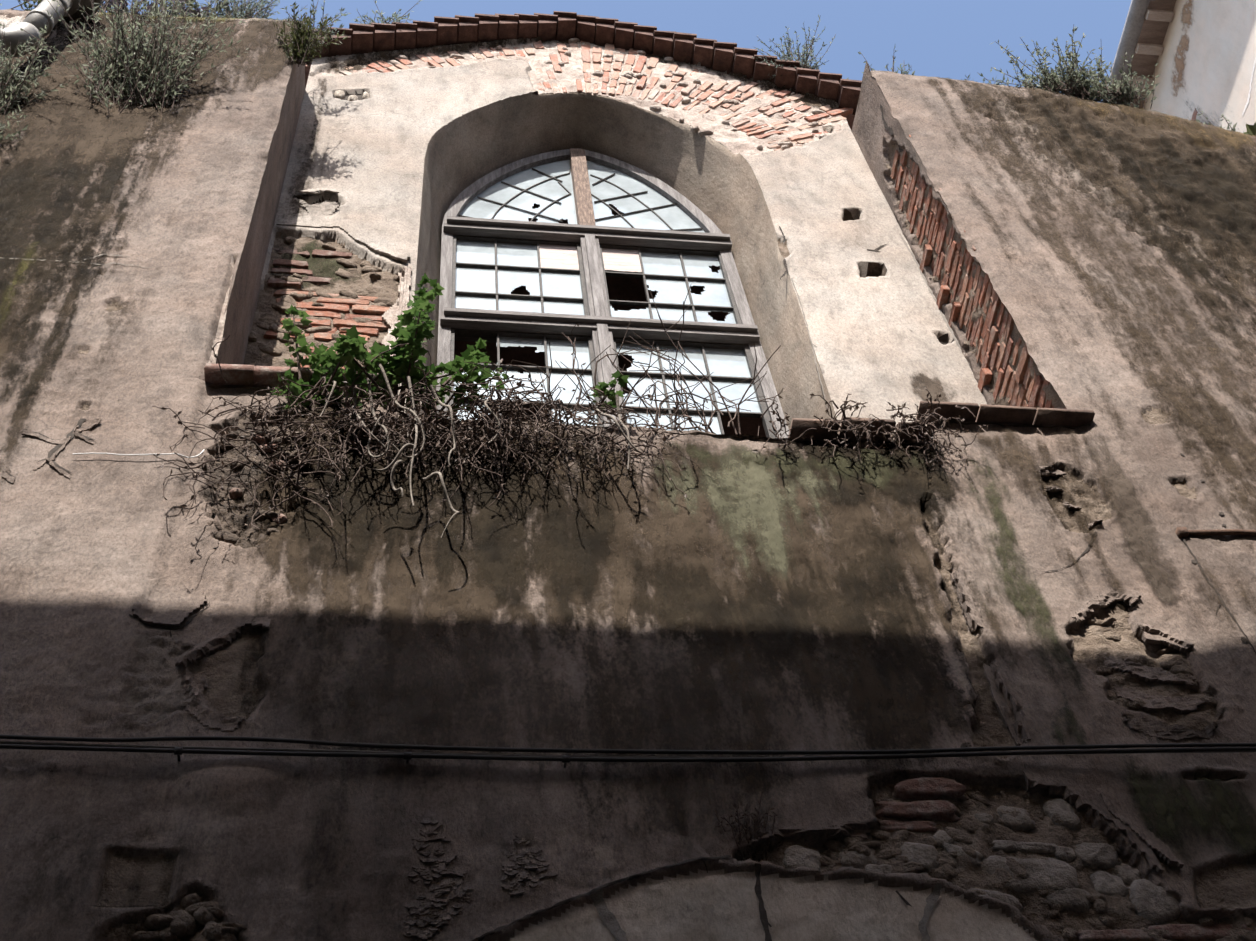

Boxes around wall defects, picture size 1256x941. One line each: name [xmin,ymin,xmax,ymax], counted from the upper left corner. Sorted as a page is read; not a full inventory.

leakage [0,14,297,468]
leakage [284,79,327,216]
spalling [243,186,412,369]
spalling [314,38,853,155]
leakage [961,87,1256,344]
leakage [1156,382,1256,471]
flaking render [122,585,271,732]
leakage [241,398,977,835]
spalling [1066,588,1223,741]
crack [472,855,772,941]
crack [895,883,942,941]
spalling [751,764,1256,941]